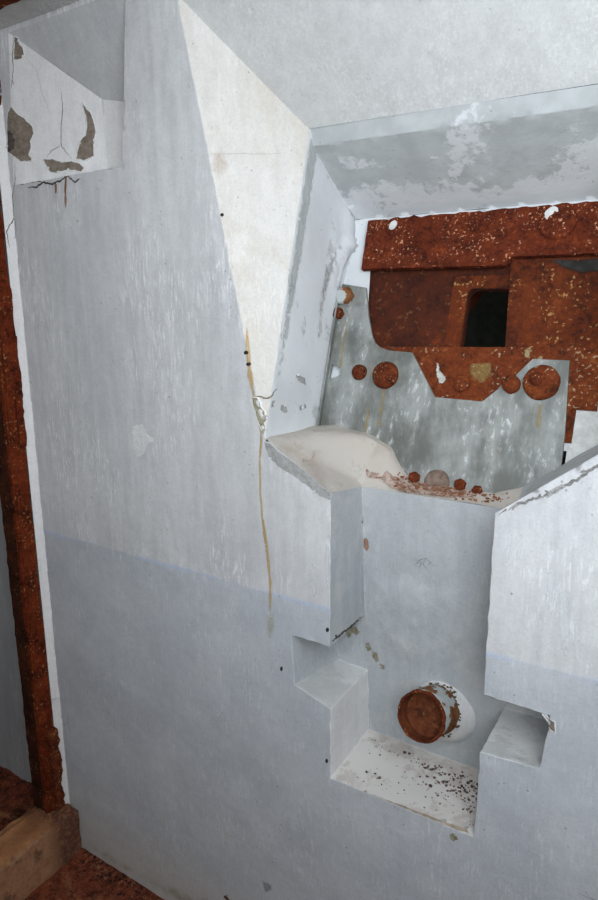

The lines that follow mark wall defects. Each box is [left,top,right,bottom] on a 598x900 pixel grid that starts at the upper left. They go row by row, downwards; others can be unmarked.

crack [6,36,79,247]
spalling [5,102,97,174]
corrosion [366,469,474,498]
crack [500,464,598,514]
crack [332,617,361,642]
corrosion [397,689,446,744]